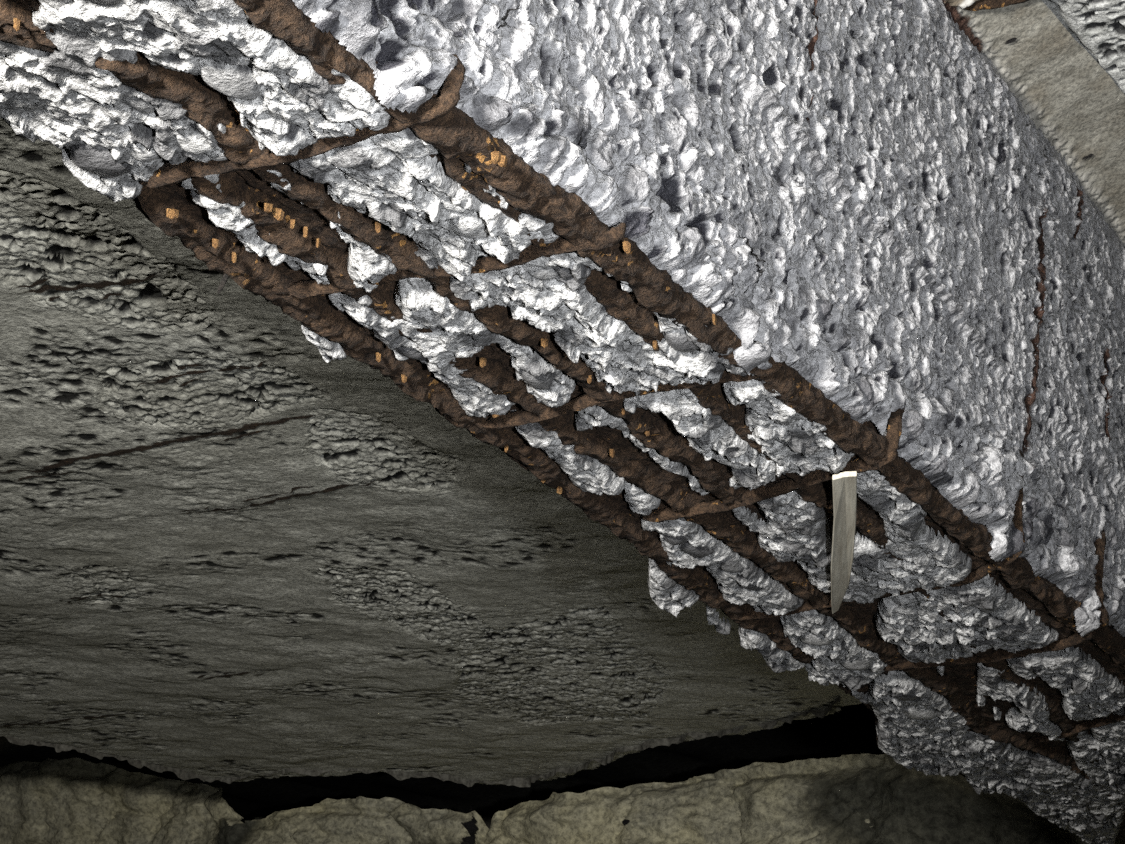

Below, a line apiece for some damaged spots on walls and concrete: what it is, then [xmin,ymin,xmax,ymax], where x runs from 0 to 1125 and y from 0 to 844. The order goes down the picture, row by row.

rust [806,0,819,122]
rust [942,0,983,54]
rust [1074,188,1084,239]
rust [18,274,169,301]
spalling [0,0,1082,664]
rust [1022,209,1048,466]
rust [138,361,266,387]
rust [1100,349,1112,442]
rust [0,413,335,481]
rust [181,478,399,514]
spalling [506,422,1125,844]